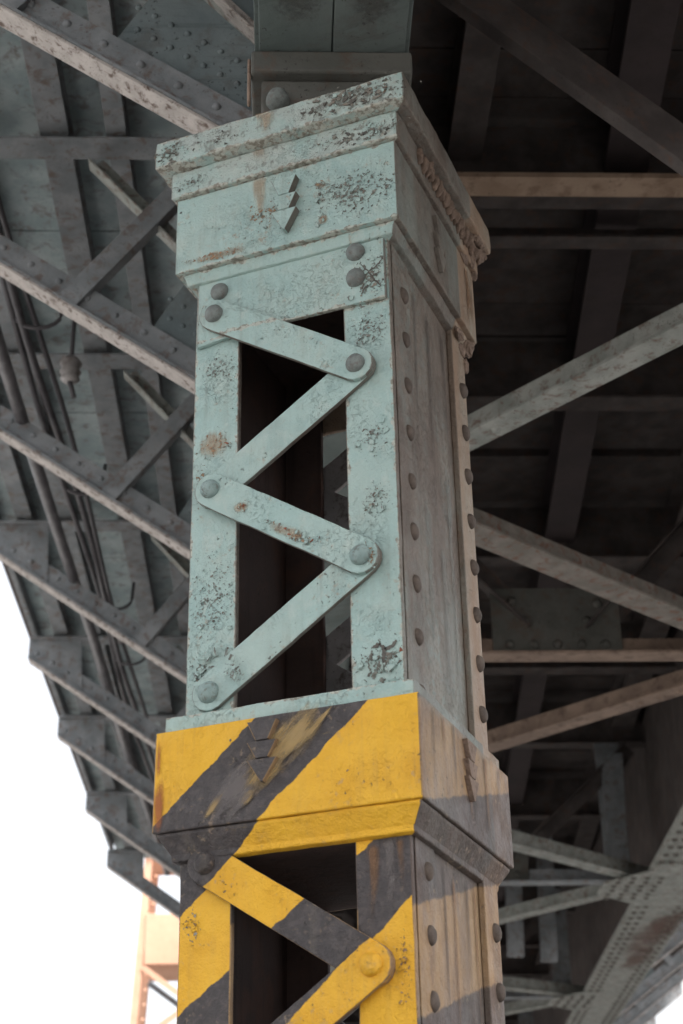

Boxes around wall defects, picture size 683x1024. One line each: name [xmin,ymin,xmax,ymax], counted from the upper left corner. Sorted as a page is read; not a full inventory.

peeling [300,76,422,123]
peeling [154,122,247,168]
peeling [309,117,410,154]
peeling [297,162,396,225]
peeling [249,201,278,233]
peeling [355,418,390,456]
peeling [363,482,392,517]
peeling [354,633,405,684]
peeling [206,708,330,816]